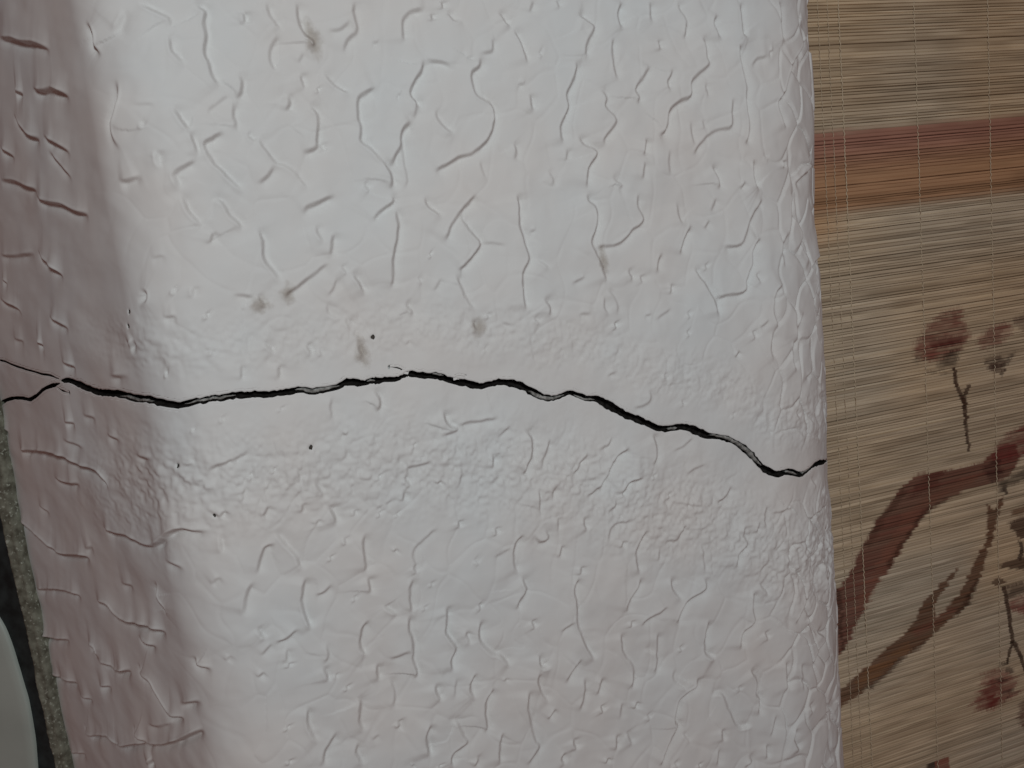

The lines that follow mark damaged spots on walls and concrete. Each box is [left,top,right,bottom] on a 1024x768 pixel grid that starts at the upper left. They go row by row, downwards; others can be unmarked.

crack [0,358,827,480]